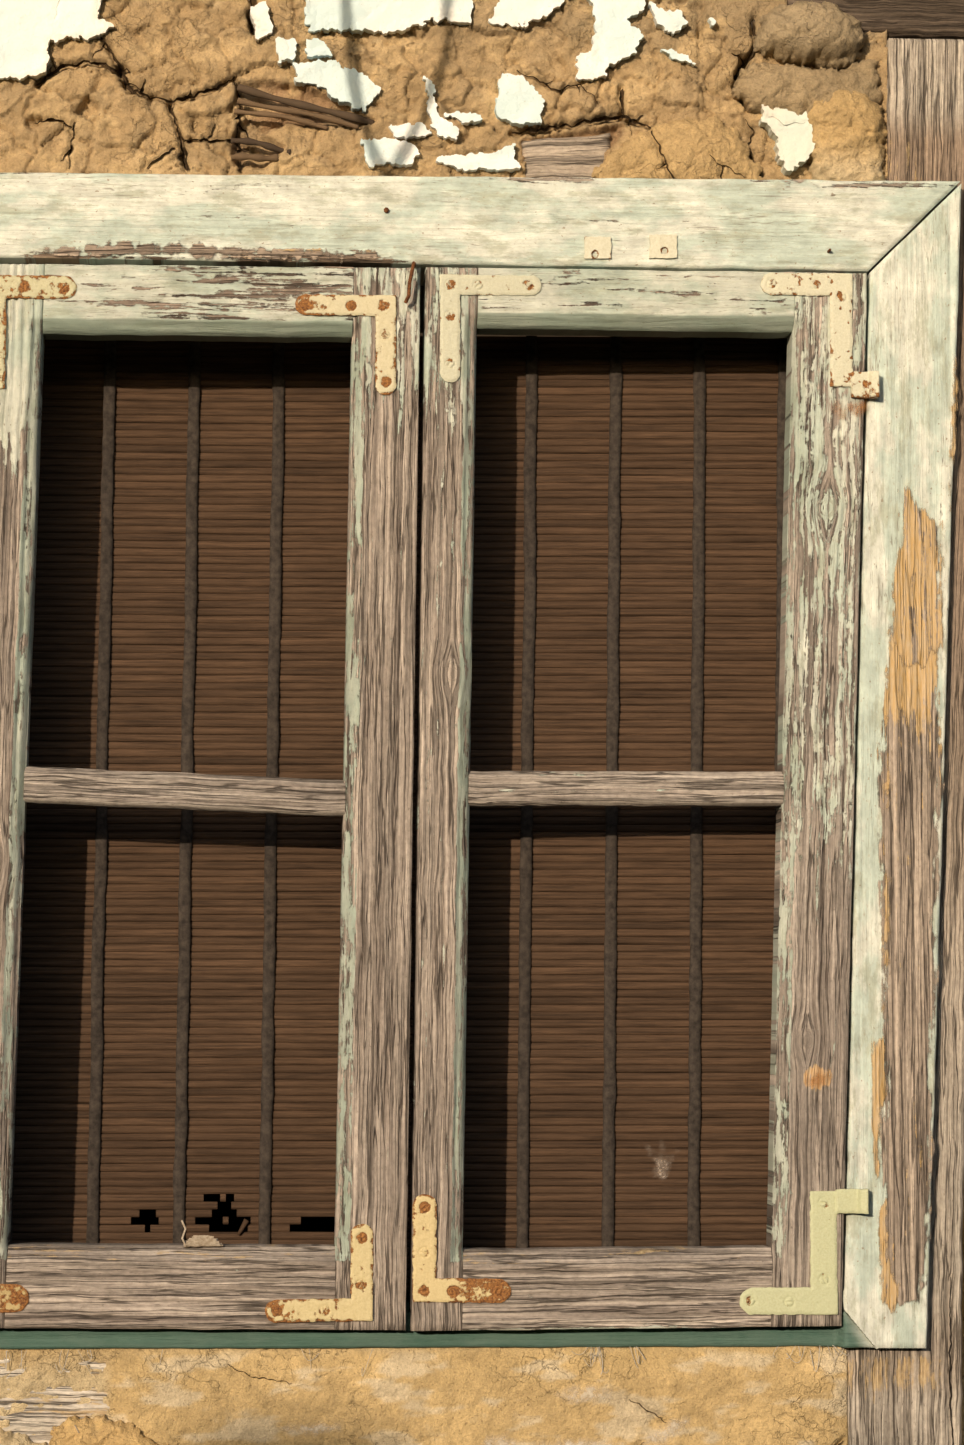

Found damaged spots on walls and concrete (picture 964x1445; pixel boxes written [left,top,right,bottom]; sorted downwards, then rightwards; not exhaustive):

peeling [0,0,114,83]
crack [35,37,248,172]
peeling [248,0,564,114]
peeling [360,73,545,173]
peeling [575,0,696,83]
peeling [759,104,815,176]
peeling [949,359,958,457]
peeling [871,486,951,1313]